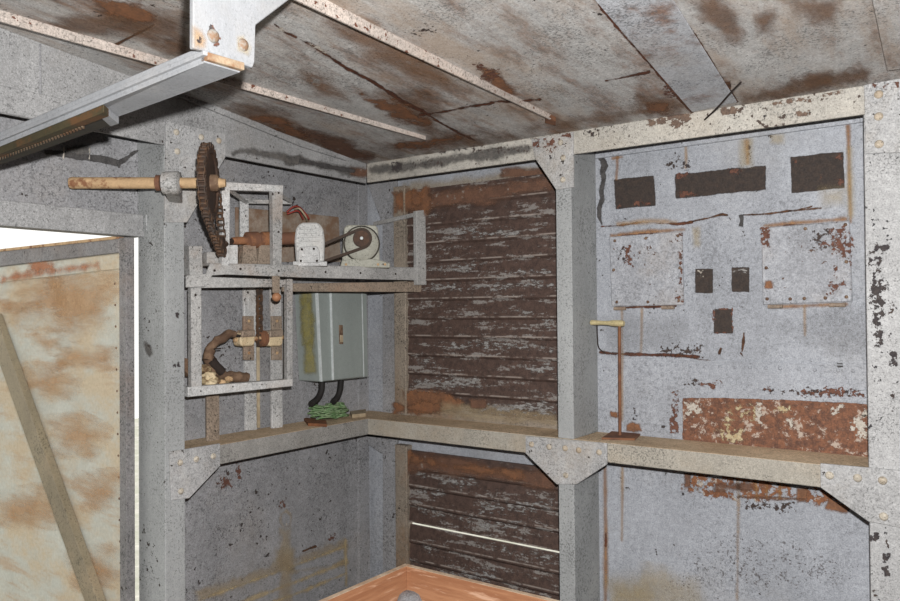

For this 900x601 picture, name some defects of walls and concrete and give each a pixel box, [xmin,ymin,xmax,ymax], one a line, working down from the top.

peeling [647,113,692,129]
peeling [720,106,741,119]
peeling [758,96,812,119]
peeling [447,227,520,238]
peeling [431,269,554,291]
peeling [868,242,898,367]
corrosion [393,389,486,415]
corrosion [682,398,869,457]
peeling [417,476,477,496]
corrosion [681,473,850,513]
peeling [460,499,554,531]
peeling [870,532,891,576]